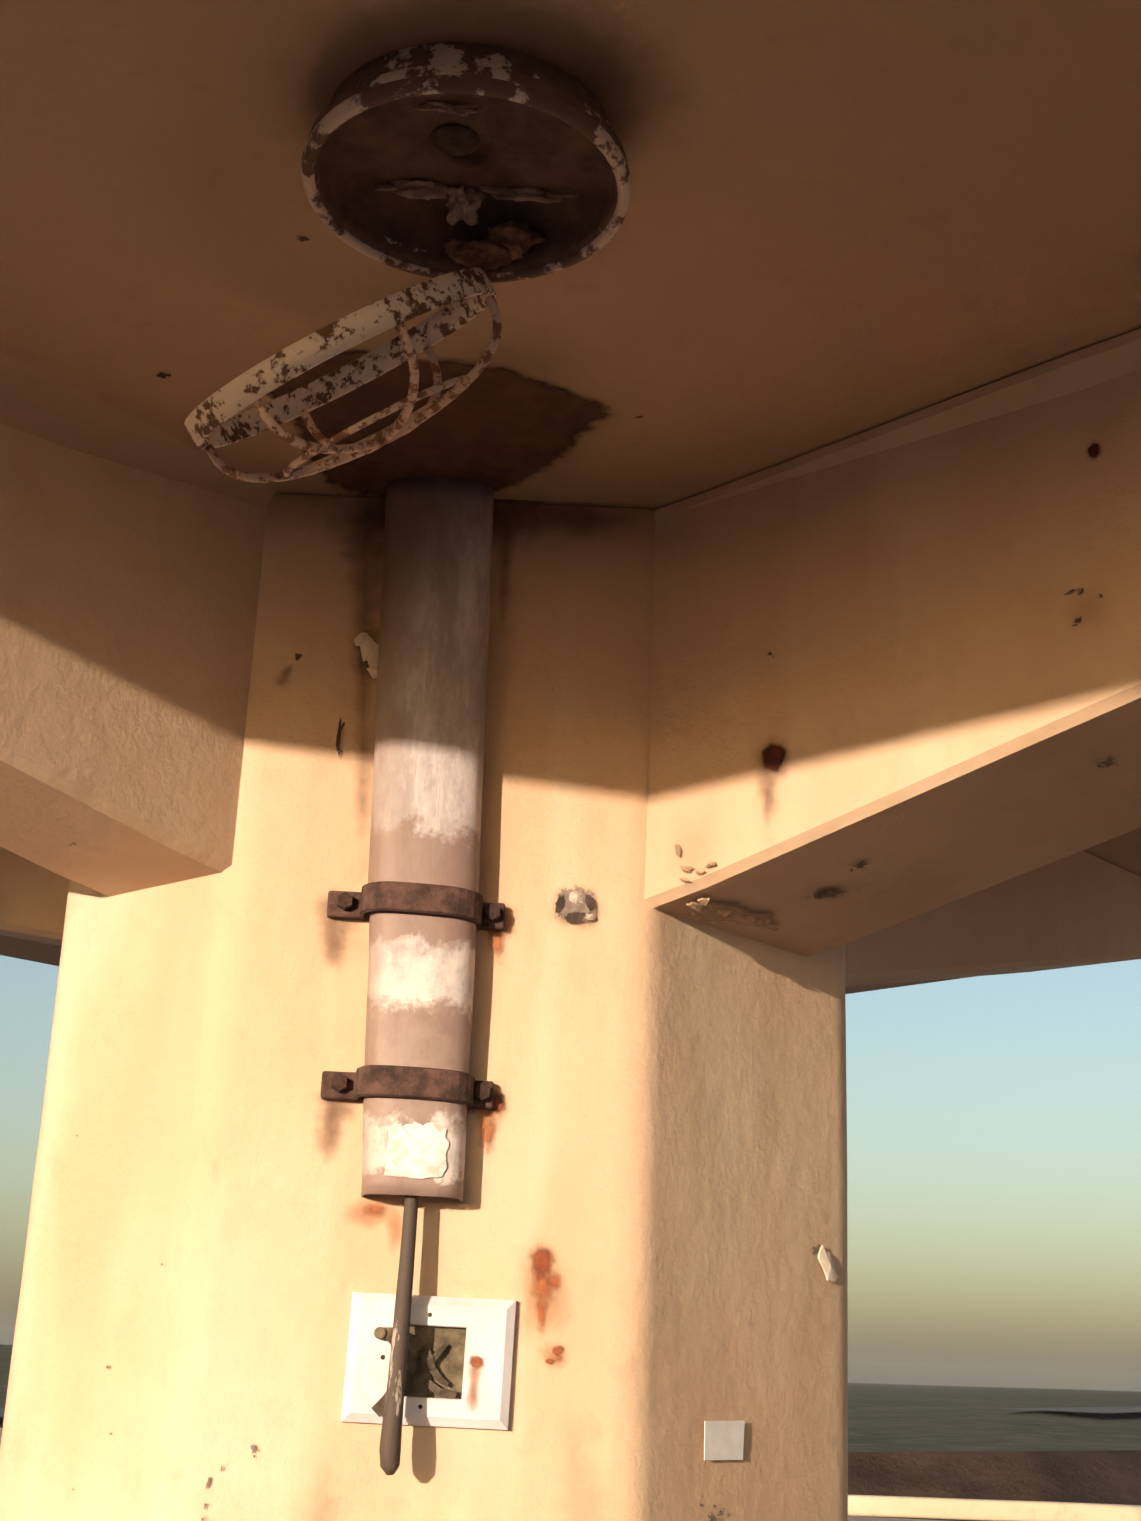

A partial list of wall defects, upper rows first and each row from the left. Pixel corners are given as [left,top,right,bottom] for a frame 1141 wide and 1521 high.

corrosion [483,1093,504,1144]
corrosion [531,1248,559,1326]
corrosion [545,1346,563,1364]